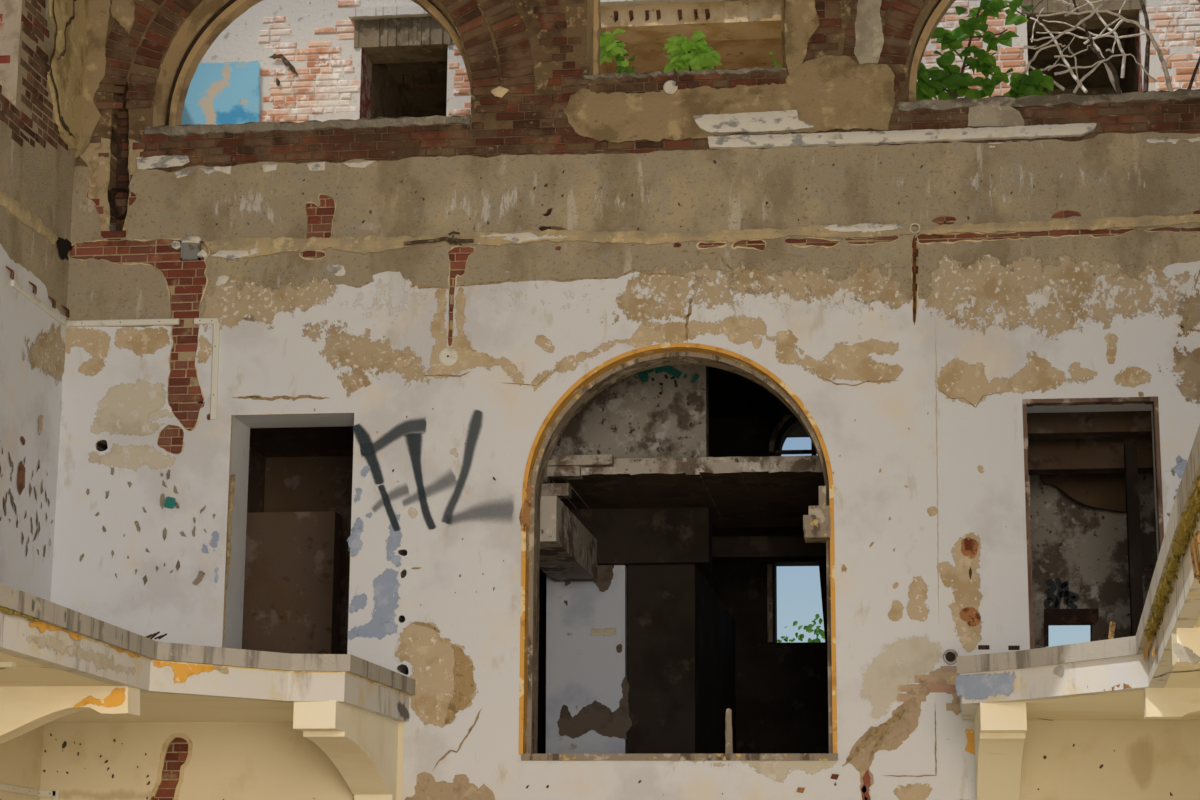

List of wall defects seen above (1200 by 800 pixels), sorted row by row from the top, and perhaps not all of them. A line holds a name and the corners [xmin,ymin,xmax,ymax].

crack [50,0,77,138]
peeling [0,0,1200,517]
leakage [1158,283,1200,404]
peeling [0,436,53,558]
peeling [347,466,372,557]
peeling [347,507,418,640]
peeling [888,576,930,621]
peeling [937,533,983,652]
leakage [1172,643,1200,664]
flaking render [137,733,193,800]
flaking render [677,666,961,792]
crack [842,709,937,800]